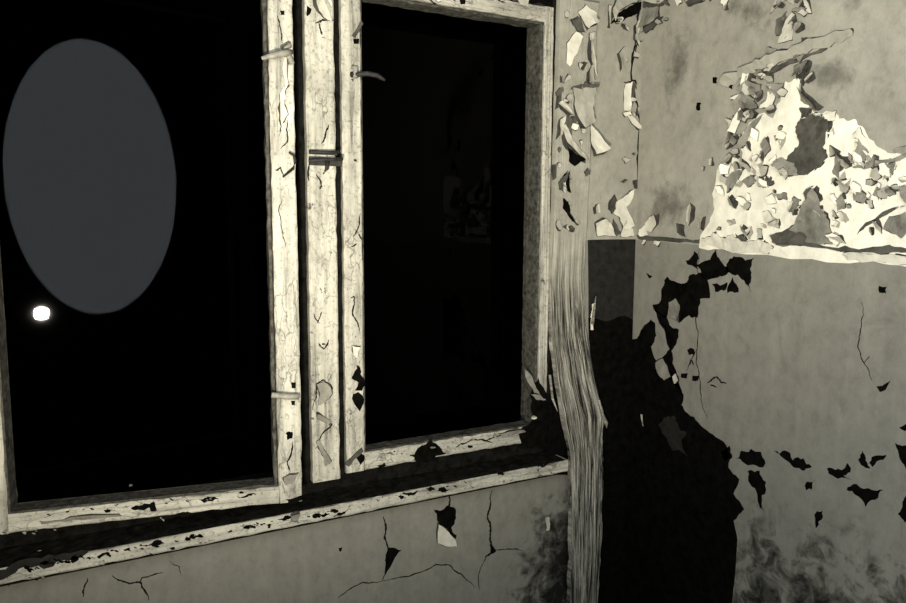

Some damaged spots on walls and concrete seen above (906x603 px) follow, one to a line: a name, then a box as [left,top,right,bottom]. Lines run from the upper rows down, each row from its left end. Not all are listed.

peeling [306,0,334,35]
peeling [551,0,646,232]
peeling [588,0,906,603]
peeling [352,345,366,411]
spalling [537,359,568,467]
peeling [283,431,299,486]
peeling [377,428,525,469]
peeling [0,534,211,581]
peeling [22,497,218,534]
crack [338,490,522,598]
spalling [398,481,466,547]
crack [543,517,551,531]